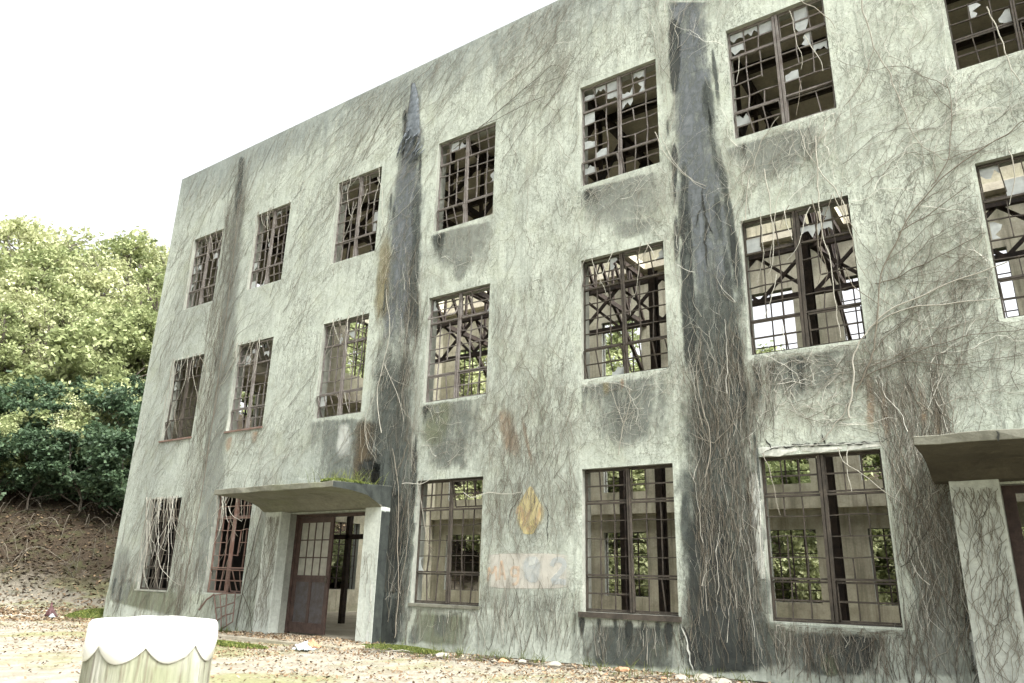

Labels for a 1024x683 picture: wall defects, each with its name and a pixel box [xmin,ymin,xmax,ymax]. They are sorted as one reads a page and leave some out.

water stain [376,110,486,336]
water stain [579,2,876,675]
water stain [311,352,478,644]